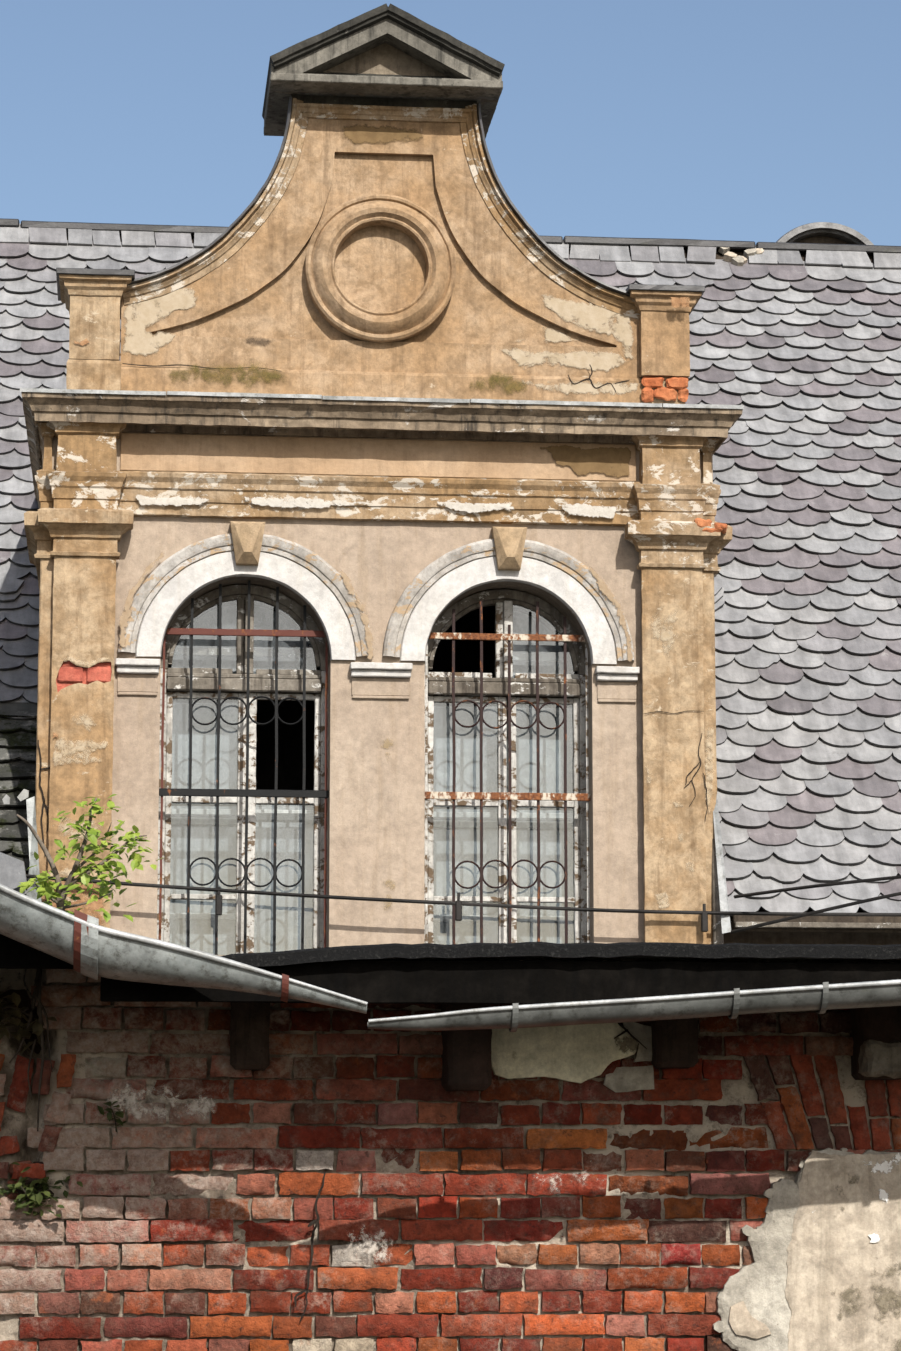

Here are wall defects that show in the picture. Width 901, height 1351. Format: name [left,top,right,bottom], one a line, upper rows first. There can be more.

flaking render [123,288,196,356]
flaking render [502,295,690,403]
crack [568,364,629,392]
peeling [136,495,208,506]
peeling [245,497,369,508]
peeling [437,501,514,513]
peeling [559,503,616,518]
spalling [58,656,112,683]
crack [644,711,708,820]
peeling [603,1022,654,1093]
damp [108,1084,215,1120]
peeling [863,1153,901,1202]